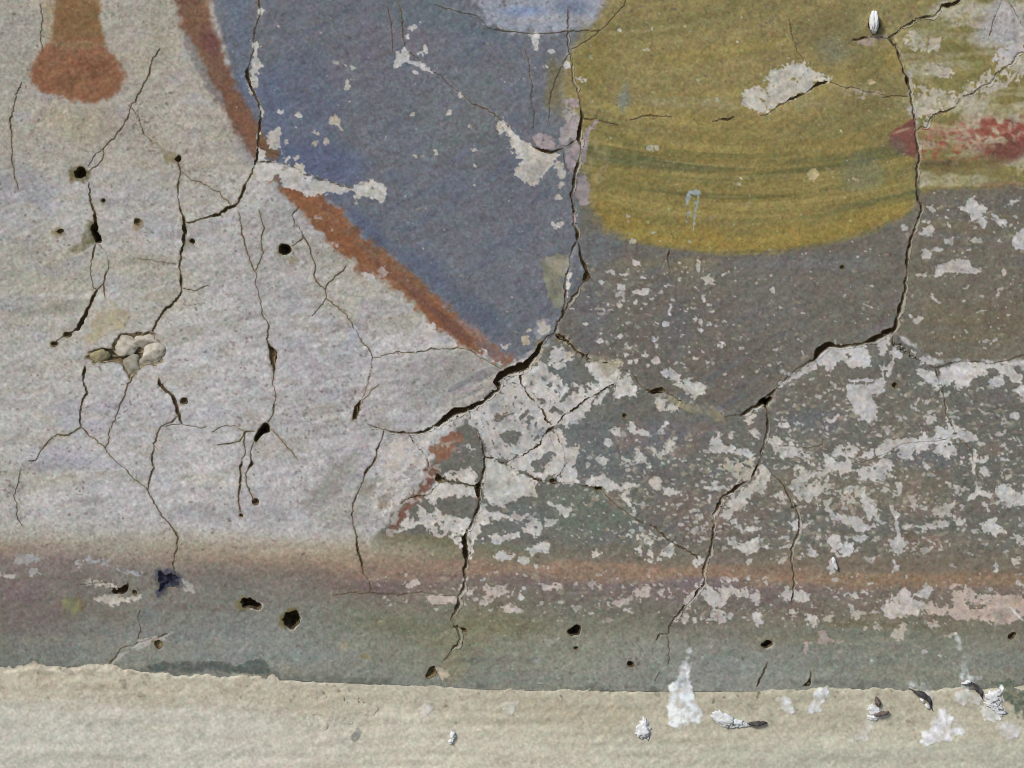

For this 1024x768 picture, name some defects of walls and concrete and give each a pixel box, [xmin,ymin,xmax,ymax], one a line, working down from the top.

crack [9,82,22,187]
peeling [246,40,387,204]
peeling [496,97,599,230]
crack [13,0,352,575]
crack [291,0,1024,677]
peeling [361,259,730,566]
peeling [601,336,1024,628]
crack [81,582,164,664]
damp [665,647,707,730]
damp [775,685,831,715]
peeling [850,583,1024,641]
damp [908,632,1024,747]